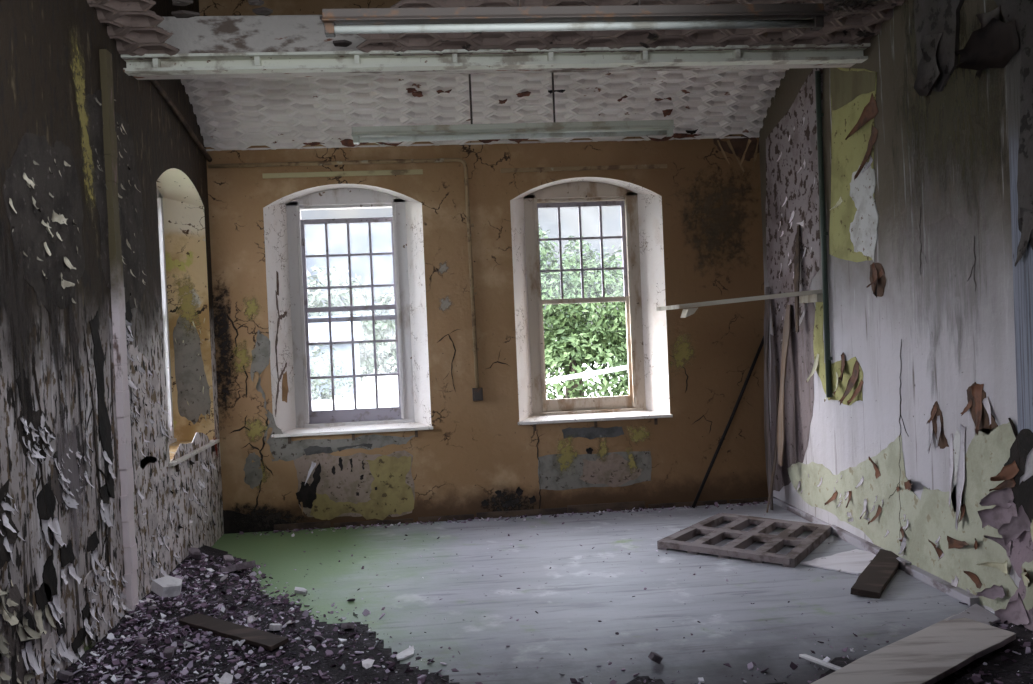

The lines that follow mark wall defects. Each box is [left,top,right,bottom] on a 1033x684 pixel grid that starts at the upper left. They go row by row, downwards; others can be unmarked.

flaking render [340,139,402,147]
flaking render [647,129,701,141]
peeling [778,196,812,281]
peeling [829,68,884,298]
damp [898,0,1003,215]
crack [170,290,287,509]
flaking render [231,329,415,520]
flaking render [538,426,652,490]
peeling [770,293,1033,634]